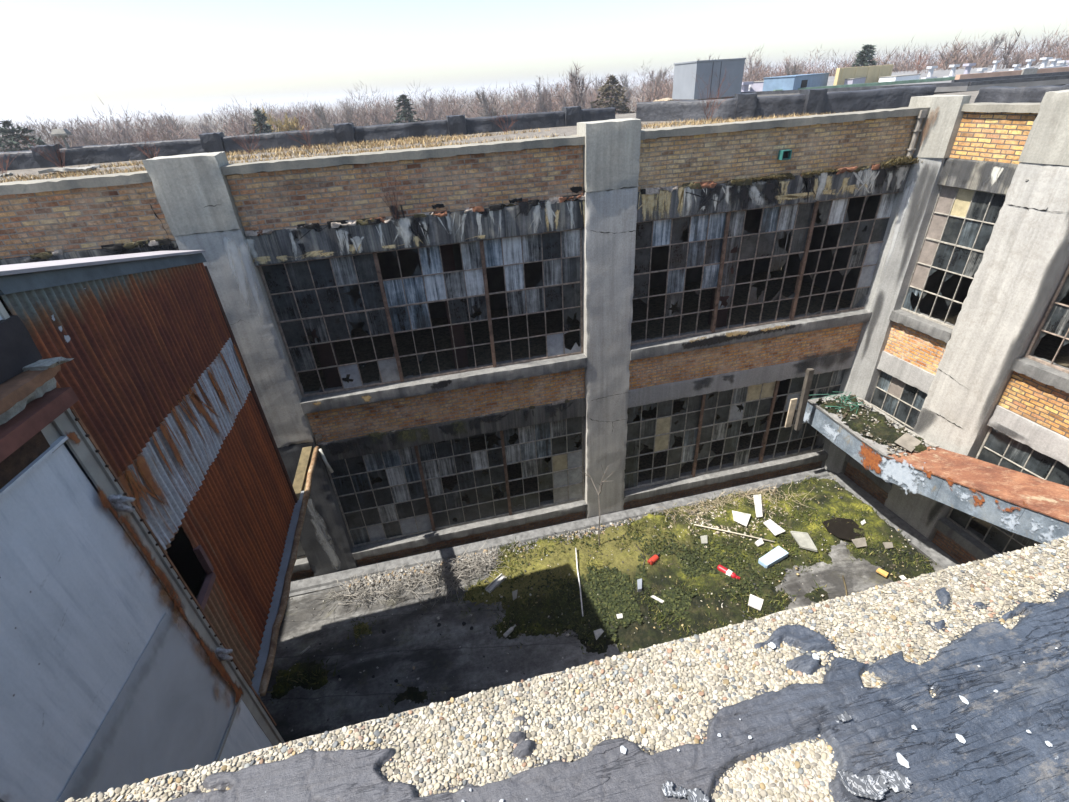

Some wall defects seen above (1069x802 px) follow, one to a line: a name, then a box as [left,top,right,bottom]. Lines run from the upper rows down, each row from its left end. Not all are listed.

water stain [376,205,501,267]
water stain [515,200,585,233]
water stain [638,160,1015,270]
water stain [223,225,364,315]
rust [152,370,230,475]
rust [858,442,882,473]
peeling [878,457,925,494]
rust [970,487,1027,512]
peeling [1000,513,1069,542]
rust [66,409,277,726]
peeling [837,711,853,722]
peeling [661,734,913,802]